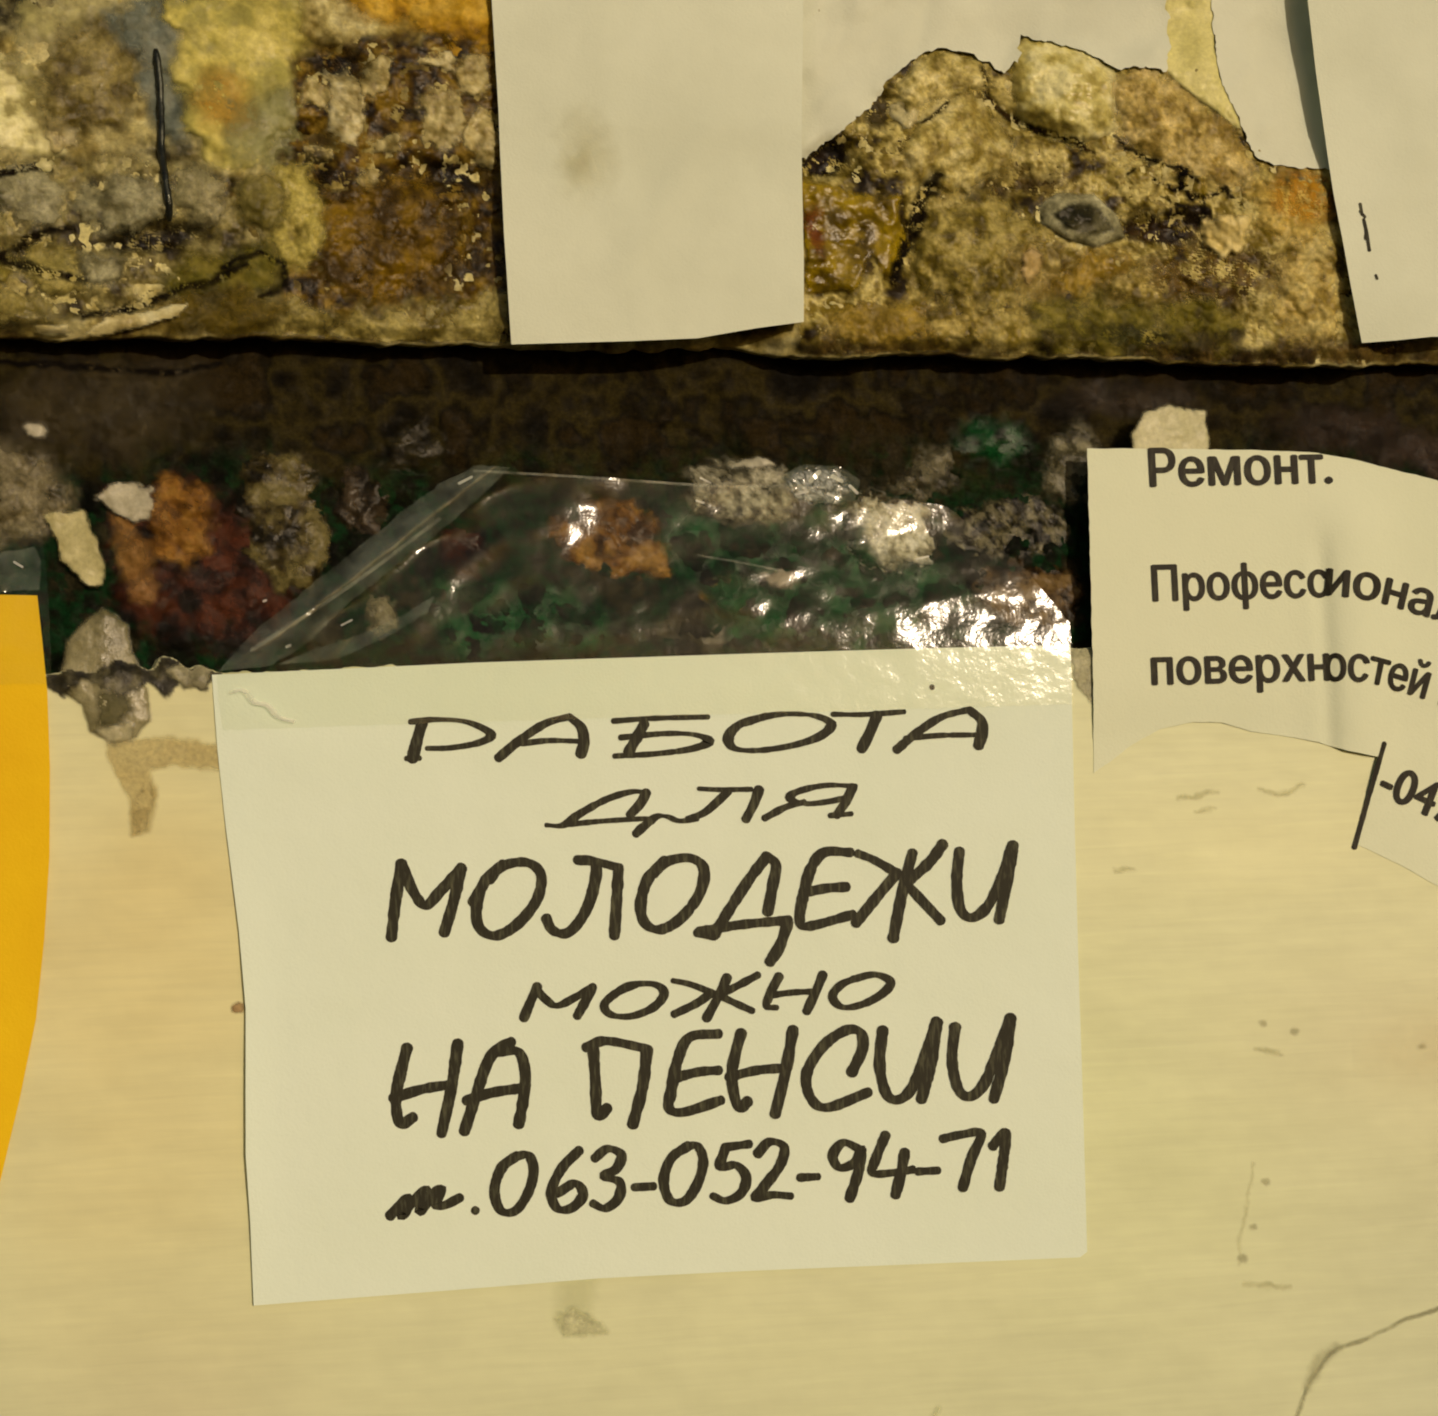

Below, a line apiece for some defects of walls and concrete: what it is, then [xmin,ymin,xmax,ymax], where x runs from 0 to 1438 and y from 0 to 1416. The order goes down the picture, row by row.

water stain [0,0,52,28]
water stain [107,0,189,144]
spalling [0,0,511,343]
spalling [795,0,1373,364]
corrosion [804,212,823,247]
water stain [166,284,286,336]
peeling [1132,405,1209,449]
water stain [685,457,848,526]
peeling [45,510,105,586]
water stain [763,569,796,588]
spalling [847,429,1099,633]
crack [1297,1307,1438,1416]